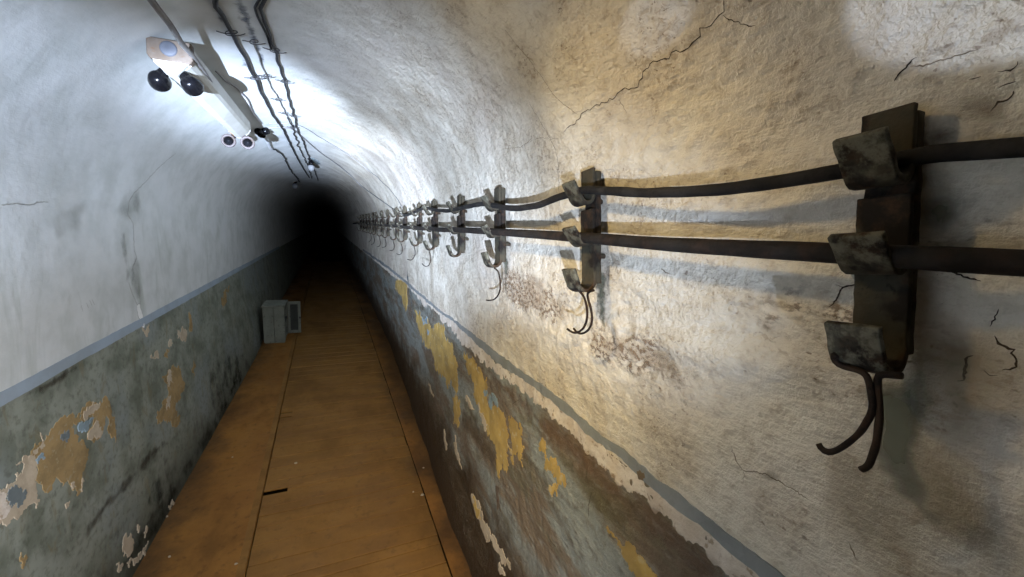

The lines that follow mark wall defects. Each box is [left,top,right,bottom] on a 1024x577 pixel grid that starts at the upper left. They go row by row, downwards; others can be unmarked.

crack [505,0,755,267]
crack [894,50,976,81]
crack [972,61,1018,112]
peeling [0,396,117,526]
peeling [150,312,196,428]
peeling [375,260,759,577]
crack [959,309,1018,381]
peeling [116,524,148,573]